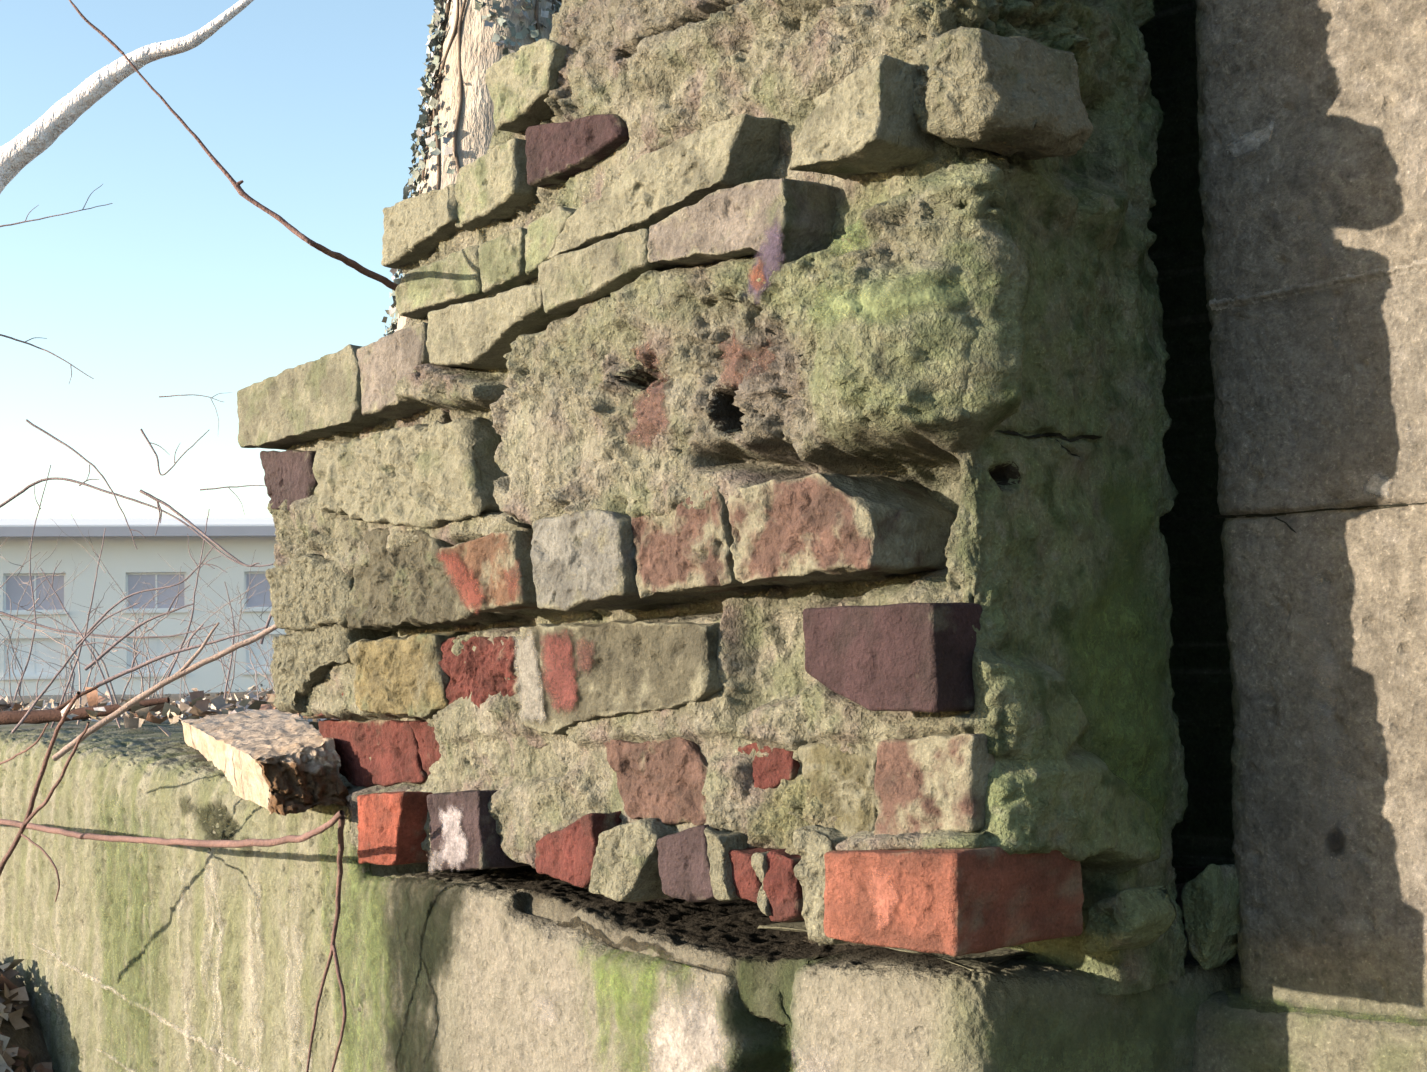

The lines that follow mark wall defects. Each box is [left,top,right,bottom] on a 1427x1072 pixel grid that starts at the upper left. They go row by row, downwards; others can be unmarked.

leakage [368,808,467,1072]